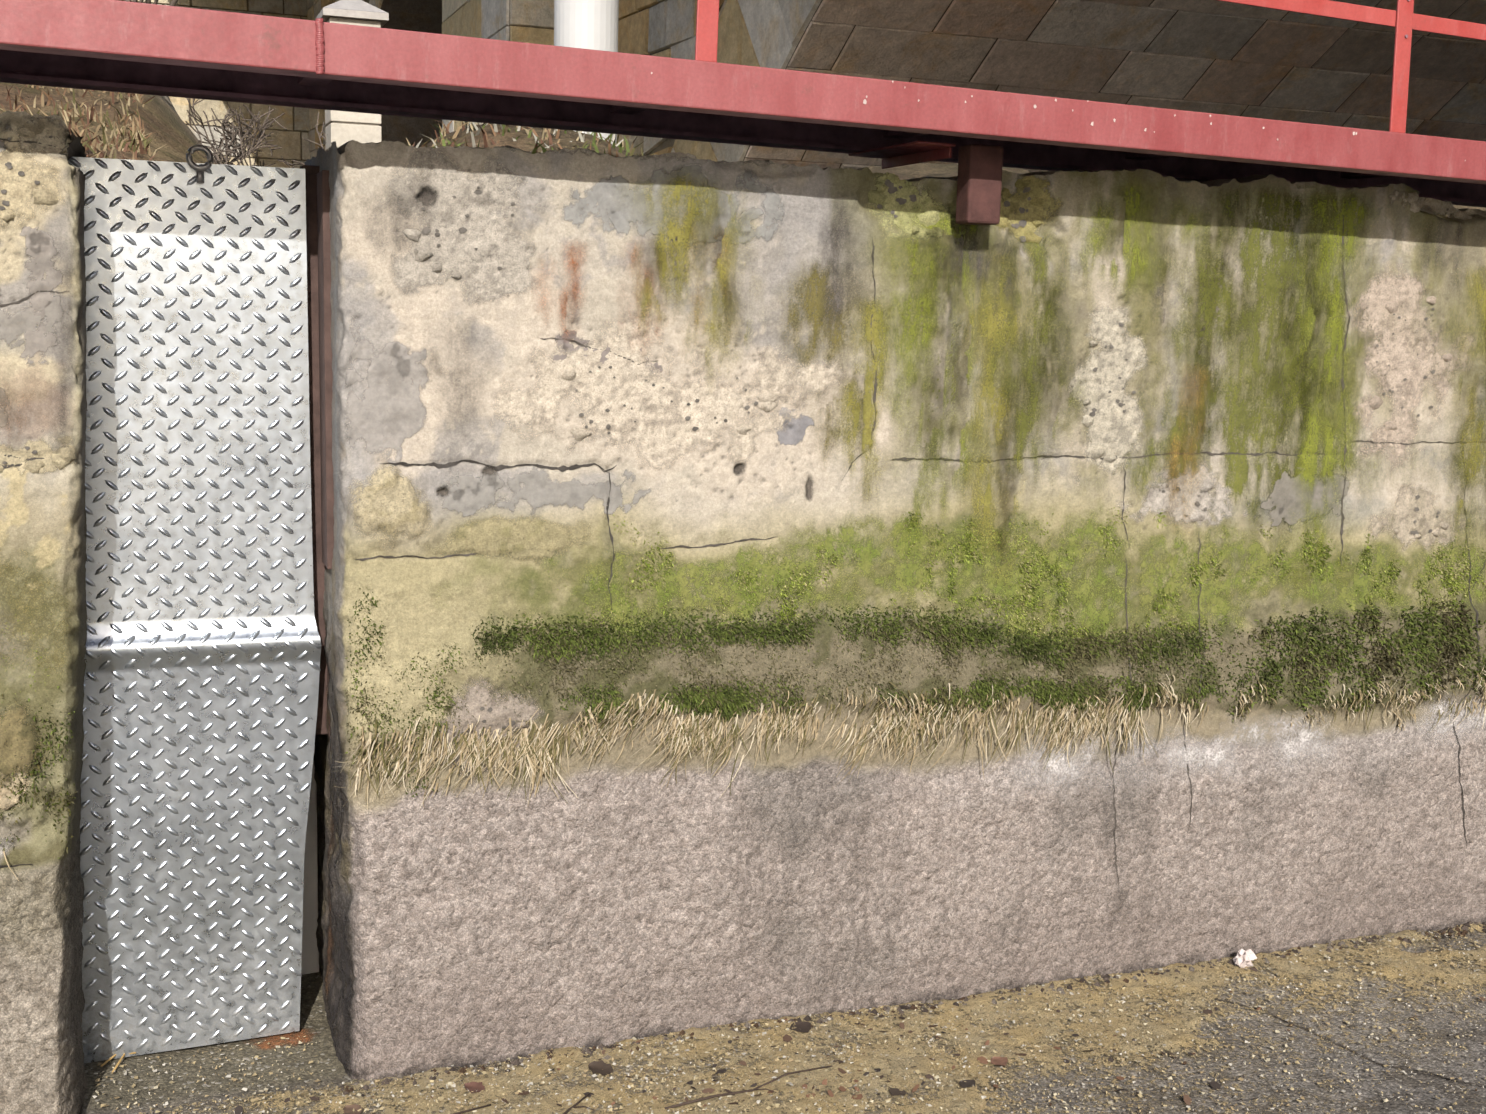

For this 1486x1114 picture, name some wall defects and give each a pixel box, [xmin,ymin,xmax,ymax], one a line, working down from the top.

crack [0,291,67,307]
spalling [378,146,536,302]
rust [561,250,577,317]
leakage [824,383,863,461]
leakage [895,241,950,525]
spalling [1069,308,1146,471]
spalling [1353,272,1473,464]
crack [356,553,477,561]
crack [379,460,617,608]
crack [660,537,774,549]
crack [842,216,1486,889]
spalling [1371,484,1469,548]